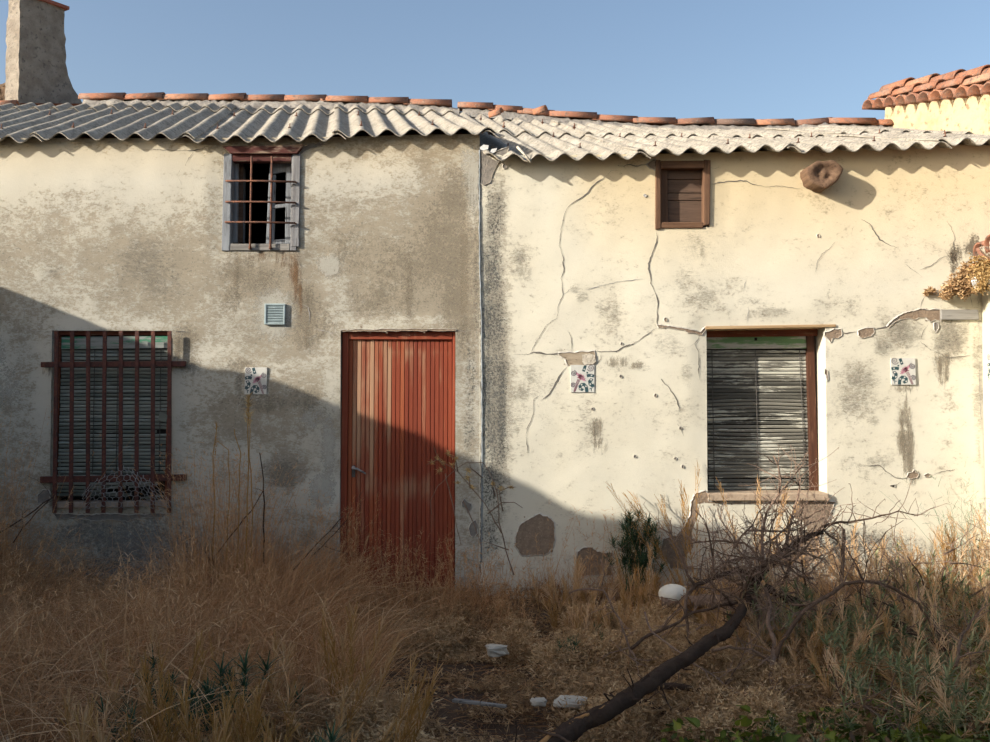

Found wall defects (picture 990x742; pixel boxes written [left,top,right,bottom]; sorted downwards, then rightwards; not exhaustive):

crack [712,168,800,189]
crack [526,164,659,453]
spalling [823,308,942,343]
crack [852,219,982,419]
water stain [464,190,508,558]
spalling [558,349,597,366]
spalling [514,512,556,557]